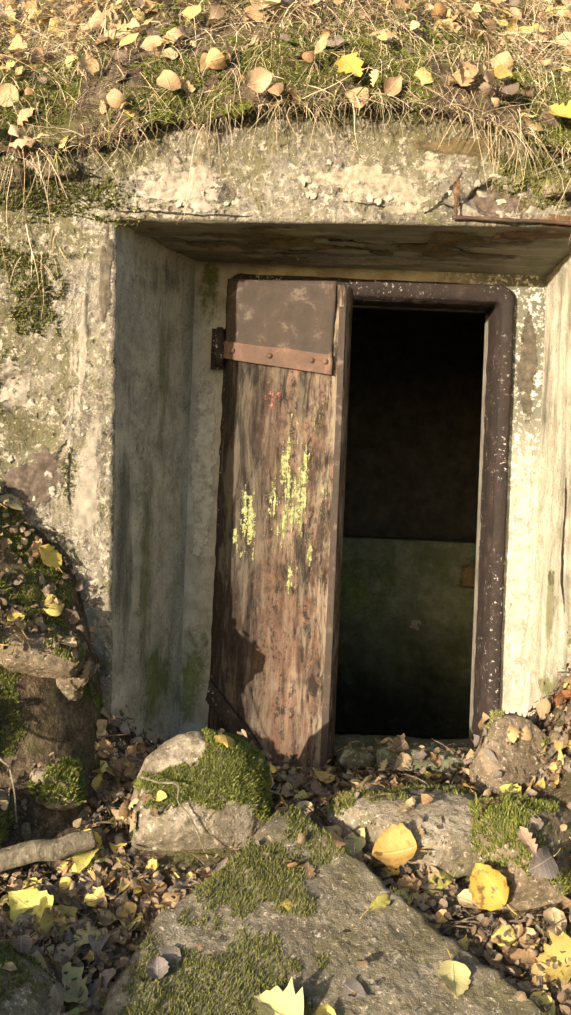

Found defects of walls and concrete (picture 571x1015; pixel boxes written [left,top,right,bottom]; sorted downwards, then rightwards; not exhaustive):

corrosion [452,178,571,241]
damp [117,467,132,633]
crack [559,478,567,604]